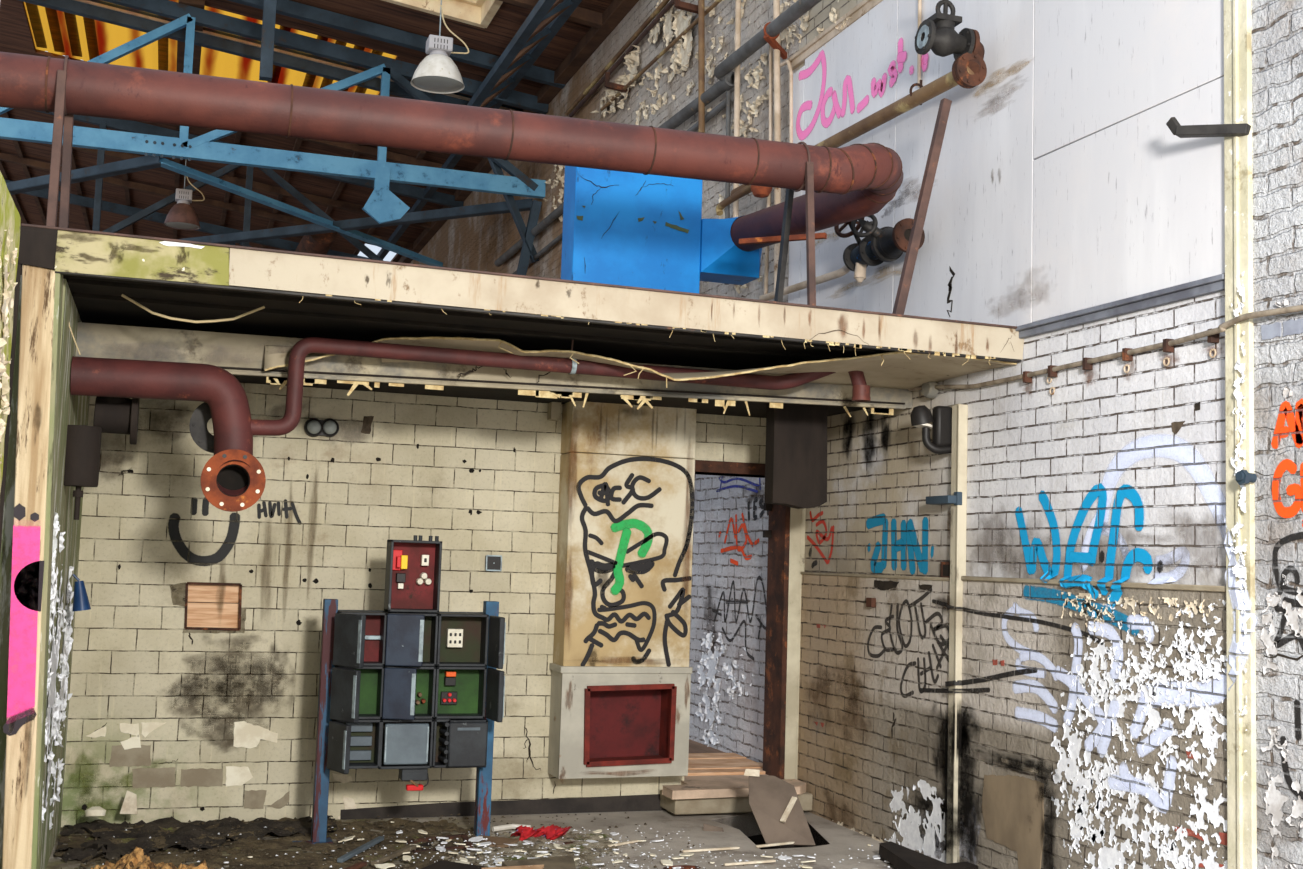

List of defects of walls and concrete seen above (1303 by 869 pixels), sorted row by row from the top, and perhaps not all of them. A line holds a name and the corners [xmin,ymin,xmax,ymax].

peeling [591,0,749,125]
peeling [707,53,774,138]
peeling [780,0,852,49]
peeling [543,165,585,222]
peeling [1002,271,1303,869]
peeling [42,509,74,830]
water stain [179,662,282,748]
peeling [695,623,755,747]
water stain [934,709,978,775]
peeling [832,779,947,863]
water stain [907,778,980,861]
water stain [1036,761,1055,869]